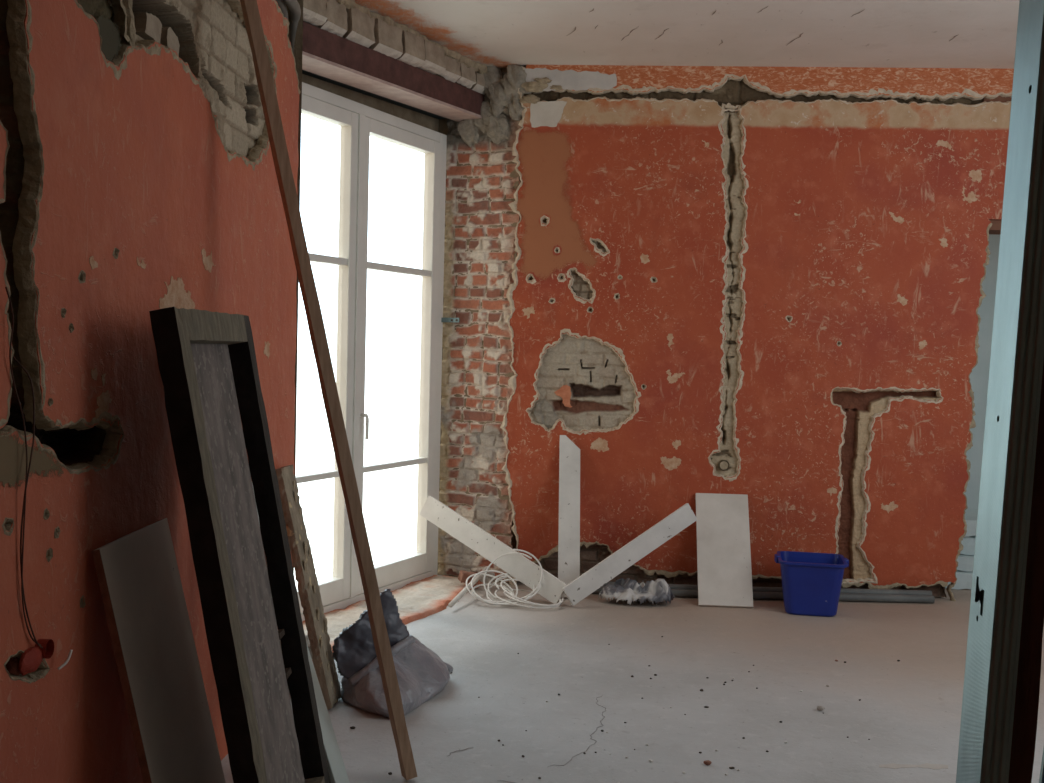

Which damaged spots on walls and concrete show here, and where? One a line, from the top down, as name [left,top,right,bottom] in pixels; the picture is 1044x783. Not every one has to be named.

spalling [74,0,270,171]
spalling [0,0,125,475]
flaking render [355,0,1012,553]
spalling [830,387,948,597]
flaking render [437,527,520,585]
flaking render [533,545,558,578]
flaking render [580,541,613,576]
flaking render [609,564,698,585]
flaking render [752,574,782,587]
crack [548,696,606,767]